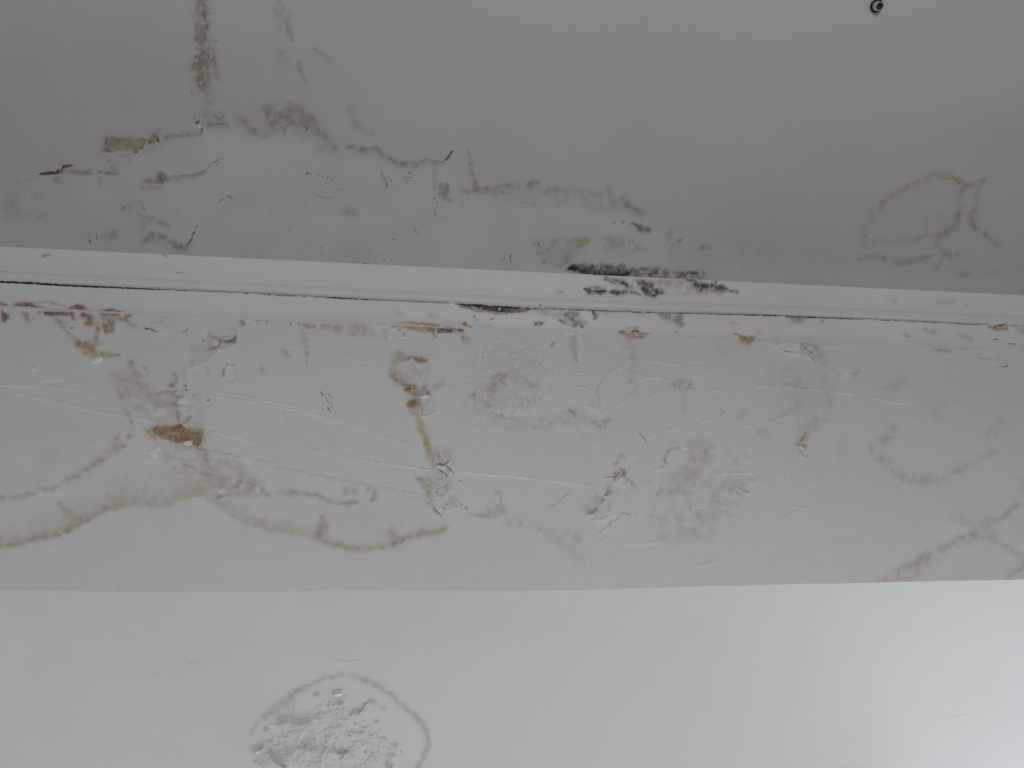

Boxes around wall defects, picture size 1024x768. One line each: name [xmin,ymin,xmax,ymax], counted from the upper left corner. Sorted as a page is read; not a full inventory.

crack [32,127,226,256]
spalling [95,126,167,165]
damp [0,0,1024,331]
spalling [139,415,219,453]
damp [0,356,612,570]
damp [641,433,755,549]
damp [864,412,1010,490]
damp [875,472,1024,582]
peeling [246,689,405,768]